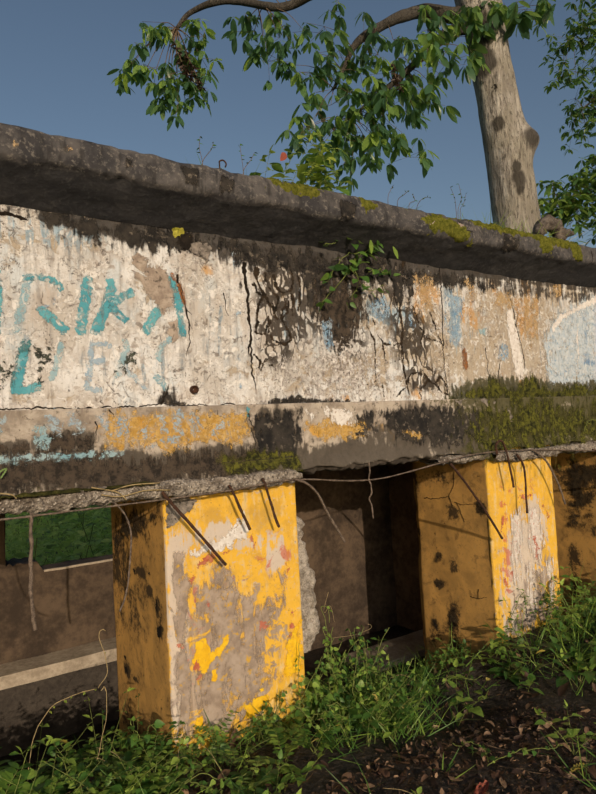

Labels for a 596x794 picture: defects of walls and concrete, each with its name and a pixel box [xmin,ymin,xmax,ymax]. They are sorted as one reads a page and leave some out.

crack [0,211,28,221]
peeling [131,253,179,343]
crack [176,274,192,356]
crack [223,262,302,390]
damp [40,210,494,356]
crack [0,385,256,448]
damp [0,395,350,499]
damp [113,501,162,561]
damp [559,456,596,529]
peeling [0,440,596,739]